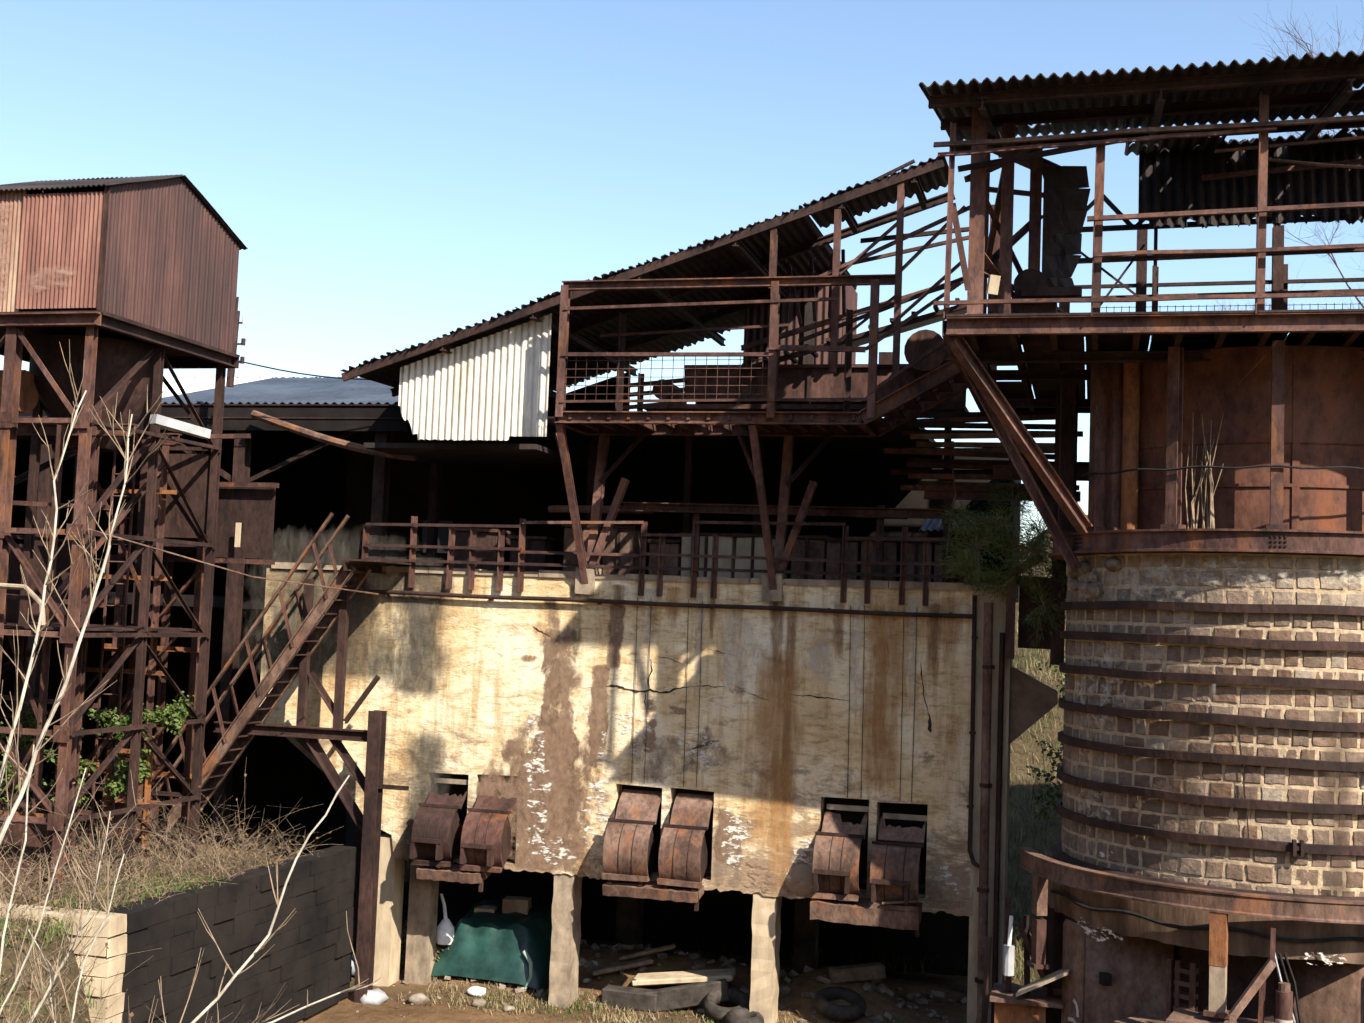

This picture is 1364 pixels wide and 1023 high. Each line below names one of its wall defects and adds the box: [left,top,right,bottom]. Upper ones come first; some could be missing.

water stain [477,601,625,874]
crack [588,656,849,711]
water stain [714,809,742,886]
corrosion [757,595,797,883]